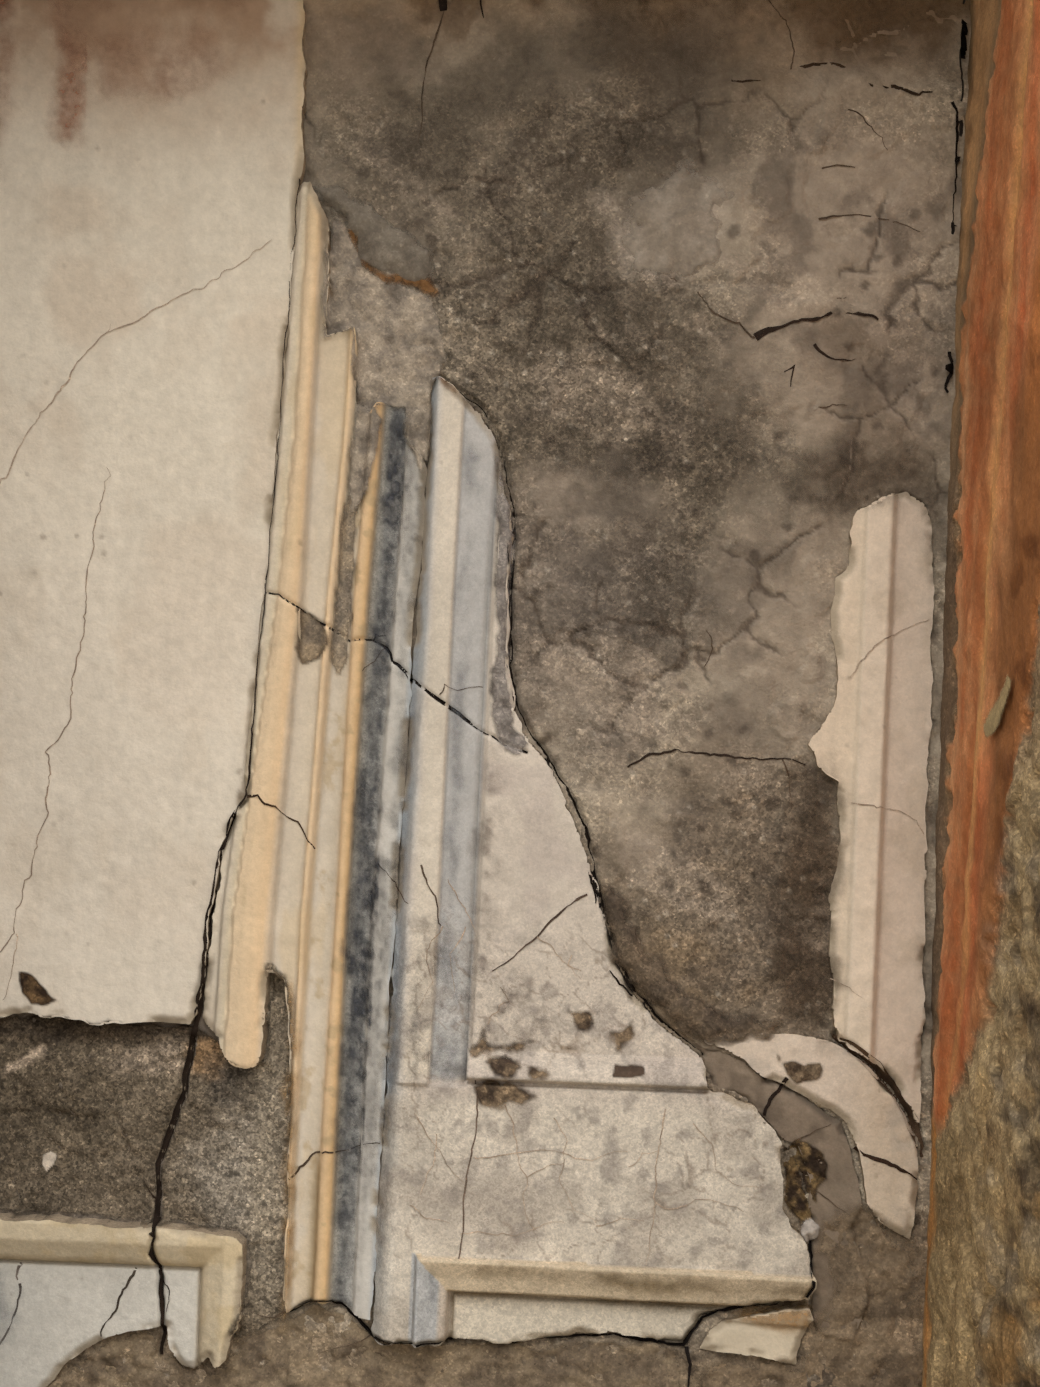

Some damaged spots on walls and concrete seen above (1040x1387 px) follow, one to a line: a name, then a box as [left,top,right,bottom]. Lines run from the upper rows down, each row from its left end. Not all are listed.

crack [731,0,968,234]
spalling [296,217,446,674]
crack [638,278,879,387]
crack [944,351,954,393]
spalling [489,459,527,754]
crack [0,179,703,1354]
crack [627,749,806,809]
spalling [0,963,680,1387]
crack [410,1080,758,1262]
spalling [778,1057,822,1083]
spalling [699,1140,923,1387]
crack [791,1034,924,1180]